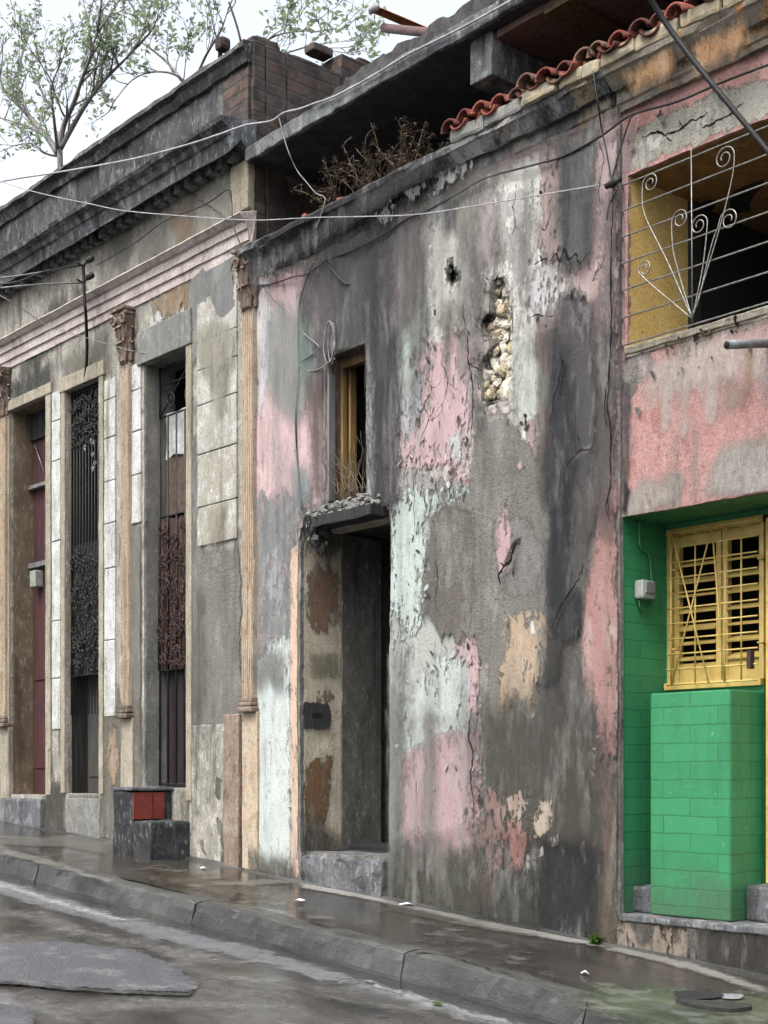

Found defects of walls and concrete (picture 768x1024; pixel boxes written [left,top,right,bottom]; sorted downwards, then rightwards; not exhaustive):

crack [641,104,741,141]
crack [512,141,613,523]
crack [412,306,487,526]
corrosion [304,562,341,635]
flaking render [389,129,592,915]
damp [384,120,631,944]
crack [498,542,517,585]
crack [551,565,584,627]
corrosion [303,754,334,832]